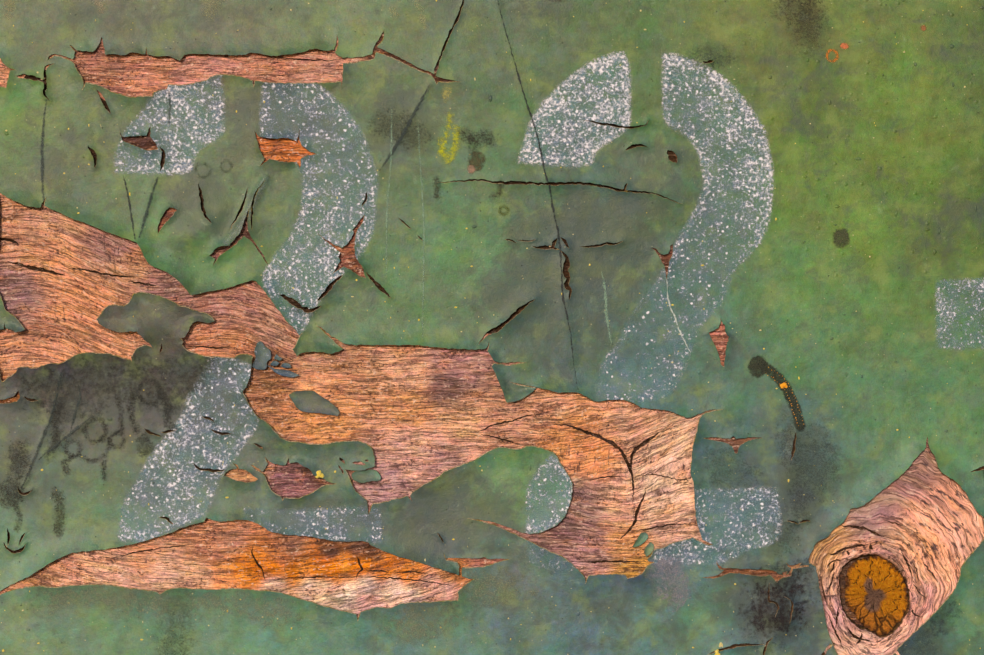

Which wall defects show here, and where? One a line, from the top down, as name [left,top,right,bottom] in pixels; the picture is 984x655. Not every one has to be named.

peeling [44,30,460,105]
peeling [254,131,315,168]
crack [437,2,681,383]
peeling [0,189,760,585]
peeling [0,505,510,621]
crack [477,414,694,563]
peeling [702,437,984,655]